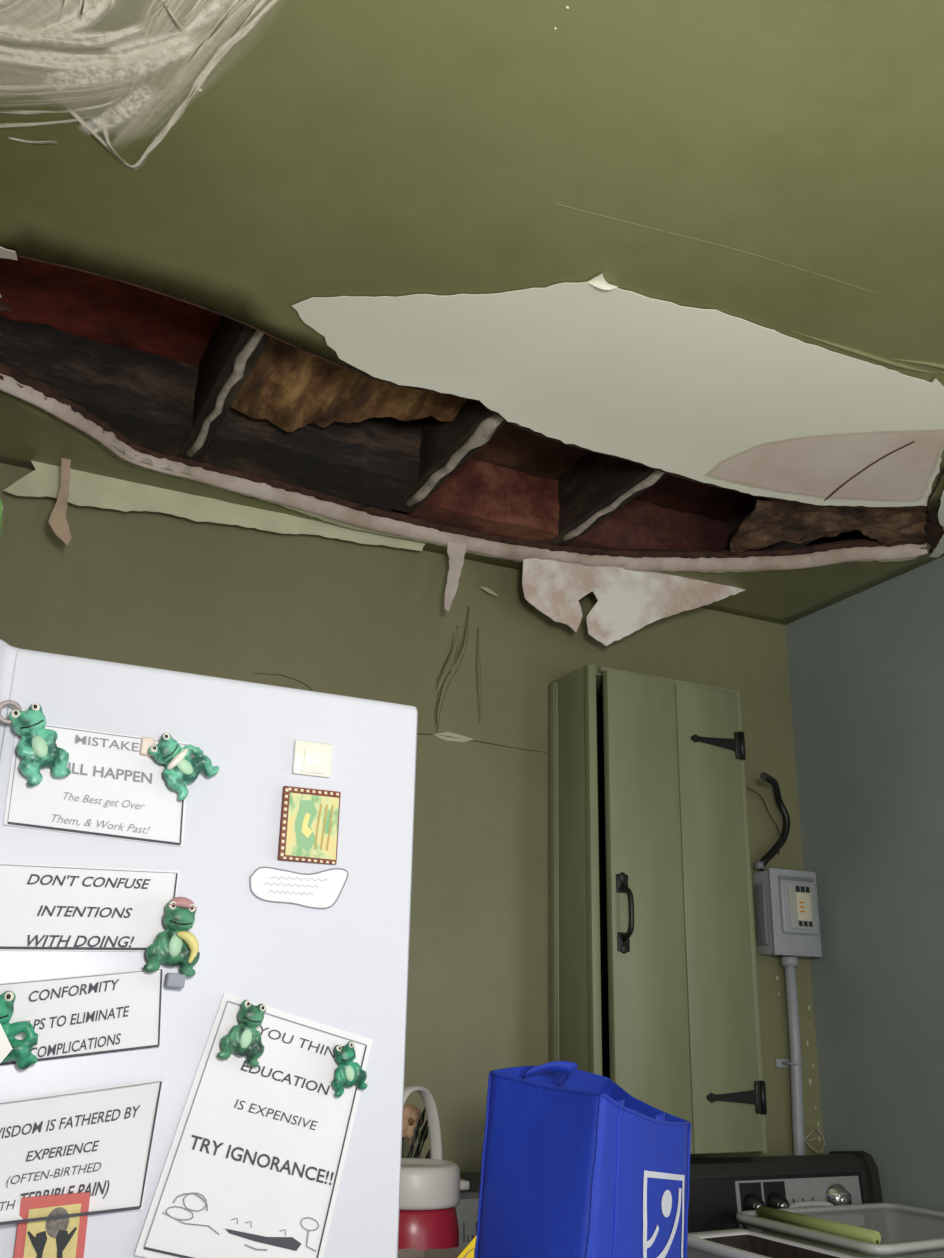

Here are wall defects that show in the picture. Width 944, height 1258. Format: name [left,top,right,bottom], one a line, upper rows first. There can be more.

peeling [0,255,944,572]
crack [423,734,546,753]